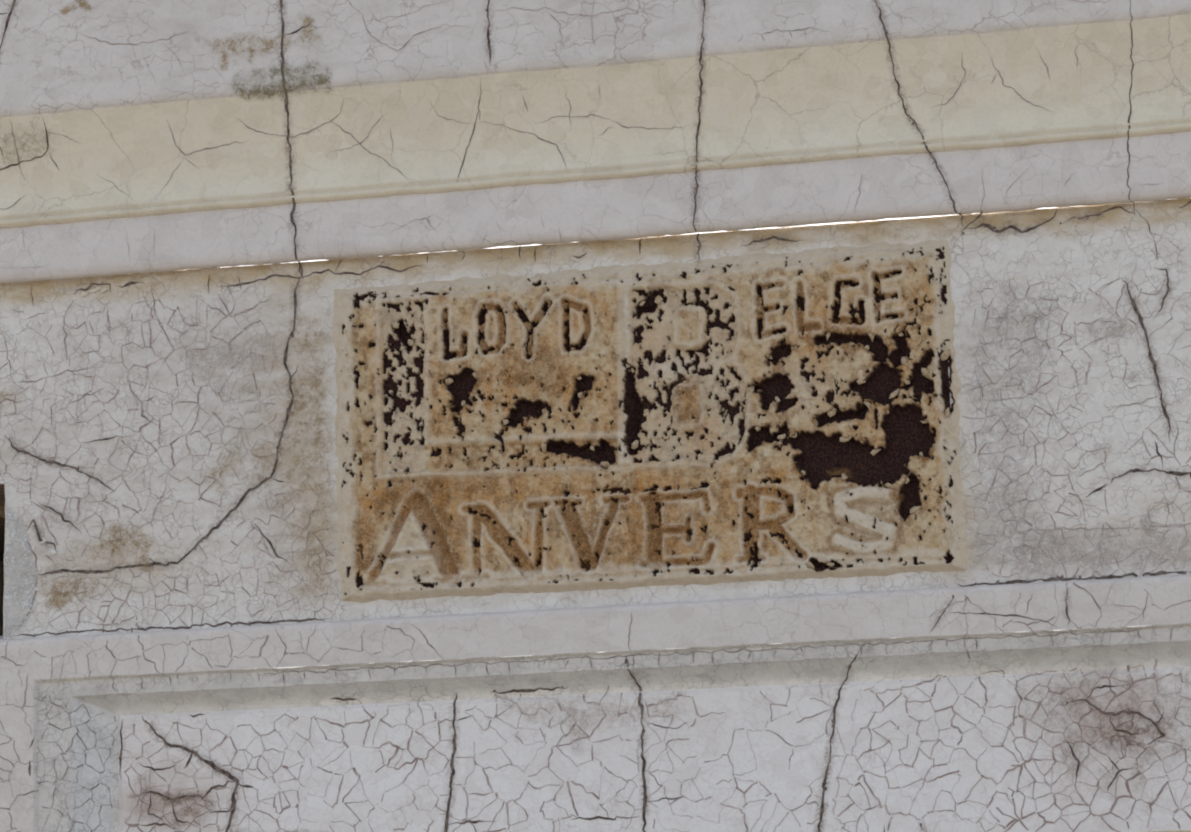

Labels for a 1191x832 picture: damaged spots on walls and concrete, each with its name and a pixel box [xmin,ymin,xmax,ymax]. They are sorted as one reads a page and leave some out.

crack [348,0,705,265]
crack [875,1,1157,255]
crack [742,236,799,246]
crack [0,0,421,637]
spalling [636,290,663,320]
spalling [443,367,478,416]
spalling [501,398,546,428]
spalling [540,359,646,471]
spalling [745,330,955,522]
crack [30,261,1191,832]
spalling [805,557,843,572]
crack [0,721,32,789]